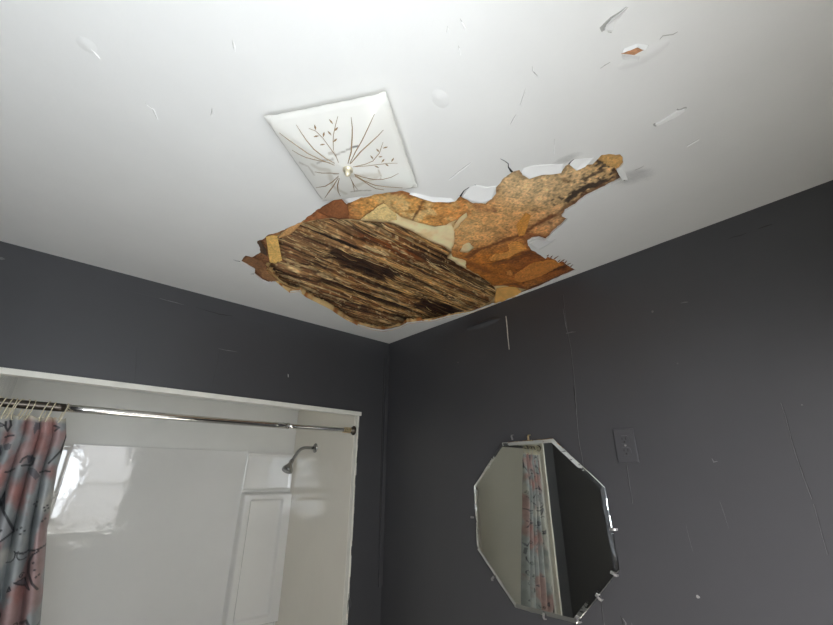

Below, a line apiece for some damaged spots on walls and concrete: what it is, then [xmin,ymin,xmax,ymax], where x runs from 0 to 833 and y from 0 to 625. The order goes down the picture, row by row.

peeling [600,7,628,33]
spalling [621,43,649,61]
peeling [598,154,623,170]
peeling [363,204,397,221]
peeling [489,241,527,261]
peeling [506,259,563,283]